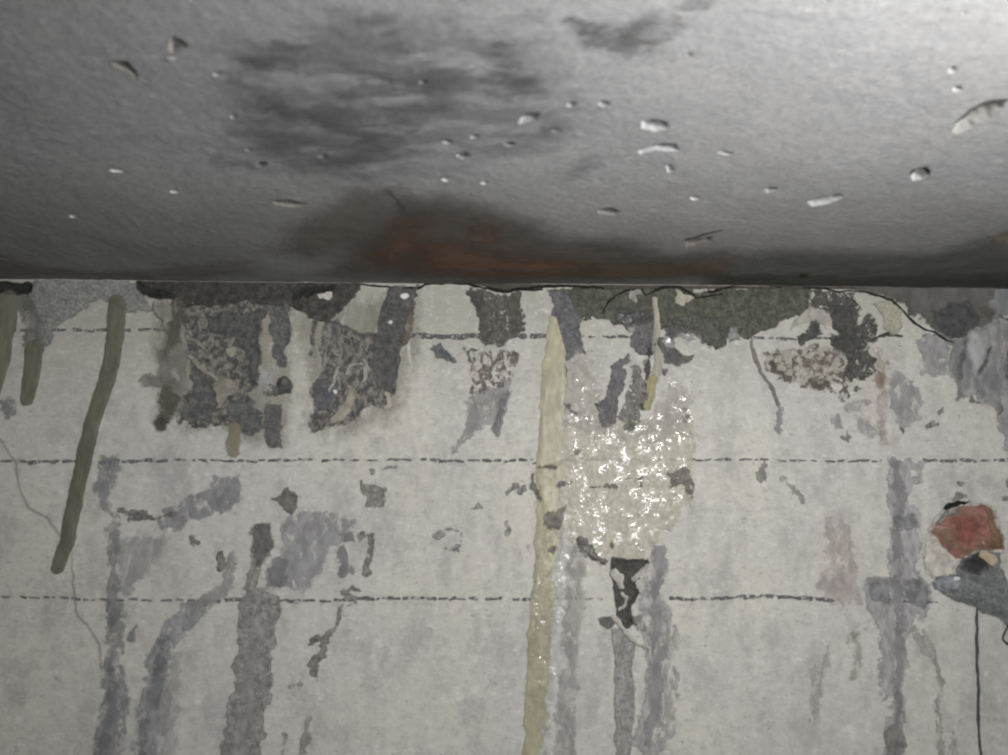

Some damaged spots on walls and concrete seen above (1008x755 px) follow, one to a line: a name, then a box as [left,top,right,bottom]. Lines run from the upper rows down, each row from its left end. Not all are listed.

spalling [951,99,1008,135]
rust [292,189,731,284]
damp [0,290,45,406]
spalling [136,281,419,457]
spalling [452,287,526,453]
crack [338,283,735,314]
crack [770,286,954,342]
damp [51,295,241,755]
damp [505,297,697,755]
spalling [923,492,1006,580]
damp [220,487,375,755]